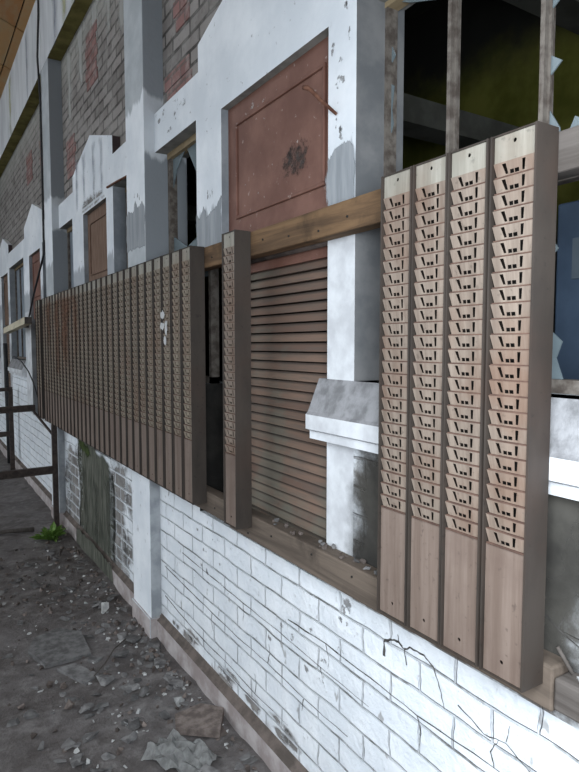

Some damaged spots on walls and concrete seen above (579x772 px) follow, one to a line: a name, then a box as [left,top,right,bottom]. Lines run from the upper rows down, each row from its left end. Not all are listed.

peeling [325,118,355,206]
water stain [76,439,116,583]
water stain [353,456,378,568]
water stain [544,494,579,673]
crack [165,552,529,772]